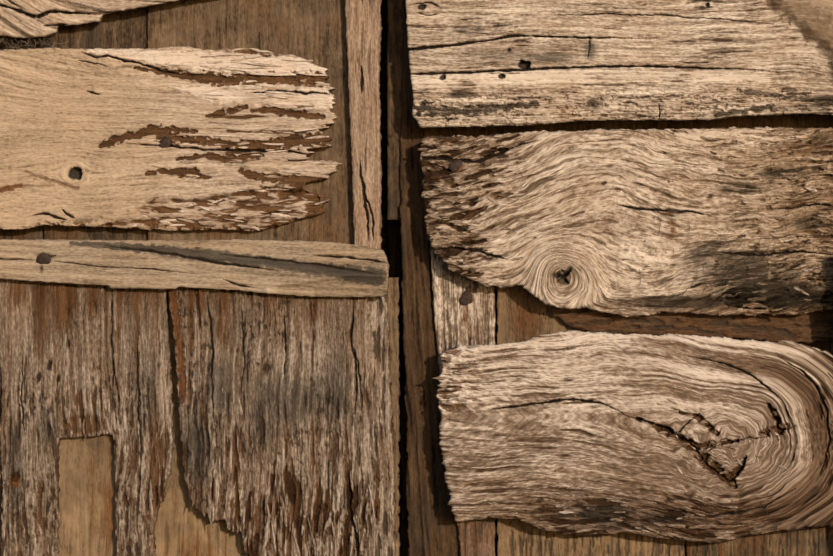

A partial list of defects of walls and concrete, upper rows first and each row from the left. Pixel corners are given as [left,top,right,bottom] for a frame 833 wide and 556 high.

crack [126,143,309,155]
crack [32,209,75,220]
crack [55,164,386,288]
crack [110,294,142,479]
crack [207,299,216,436]
crack [239,307,247,388]
crack [281,316,289,380]
crack [350,306,363,406]
crack [490,356,794,480]